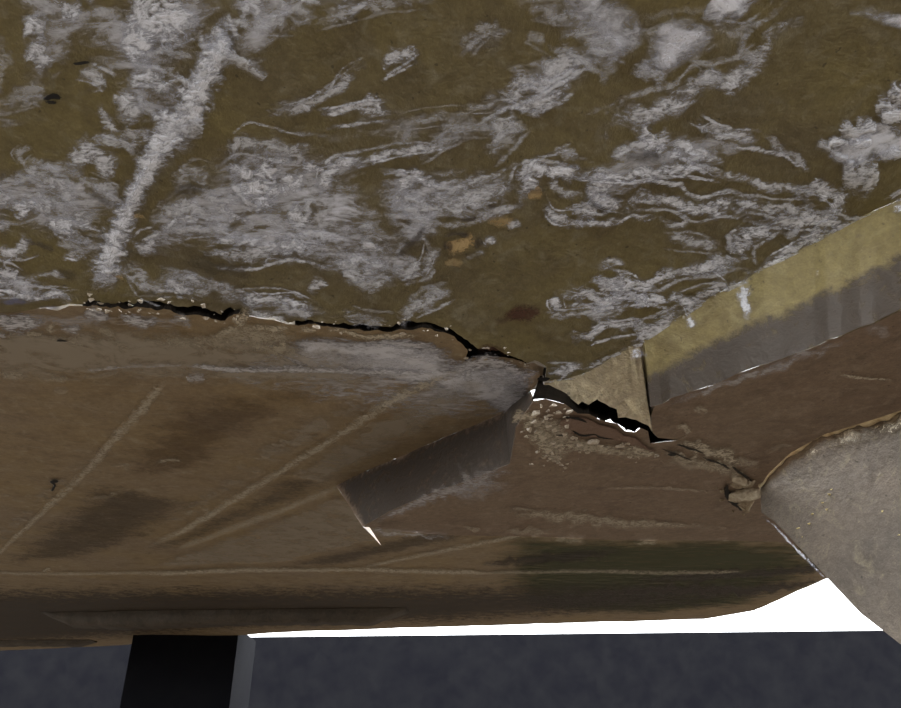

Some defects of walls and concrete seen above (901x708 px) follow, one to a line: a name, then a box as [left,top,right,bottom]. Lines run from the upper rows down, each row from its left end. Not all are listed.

water stain [643,0,750,80]
water stain [0,0,442,288]
water stain [390,169,512,240]
water stain [510,39,901,347]
water stain [0,239,64,301]
crack [83,293,240,322]
crack [295,319,529,367]
water stain [646,254,901,414]
crack [556,416,612,439]
spalling [521,376,674,472]
crack [663,444,752,511]
spalling [716,474,761,516]